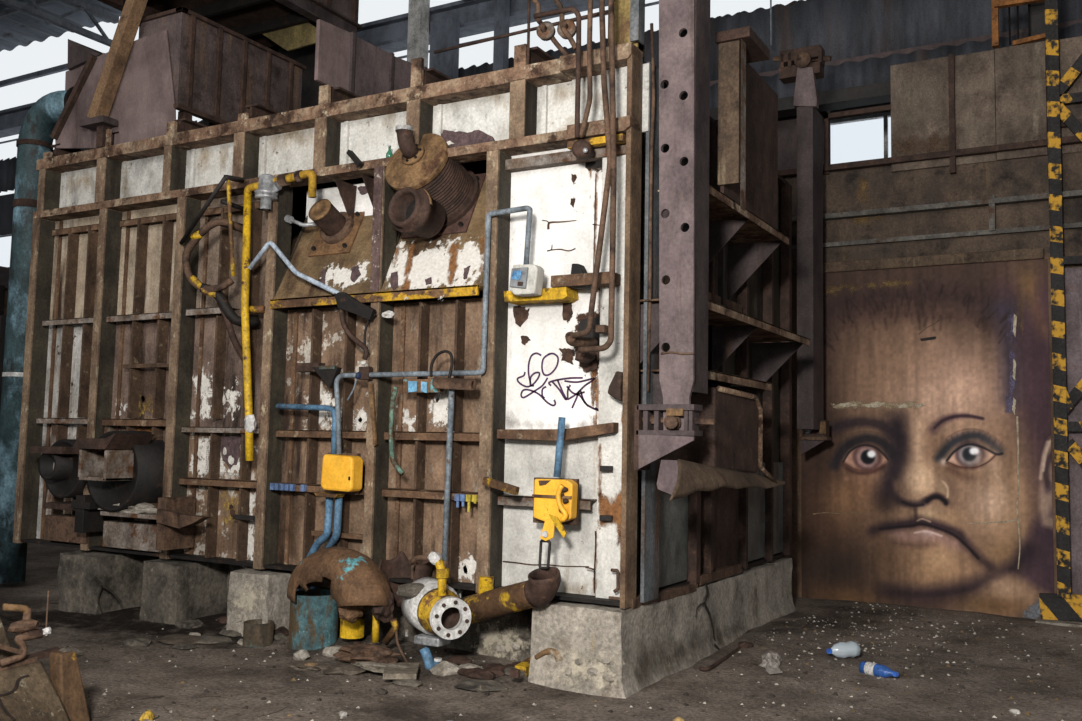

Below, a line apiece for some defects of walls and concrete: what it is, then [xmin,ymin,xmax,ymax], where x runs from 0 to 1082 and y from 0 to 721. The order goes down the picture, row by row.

peeling [320,261,370,290]
peeling [386,237,485,299]
peeling [190,363,241,421]
peeling [319,391,367,431]
rust [591,377,599,425]
peeling [189,435,256,569]
rust [594,445,621,561]